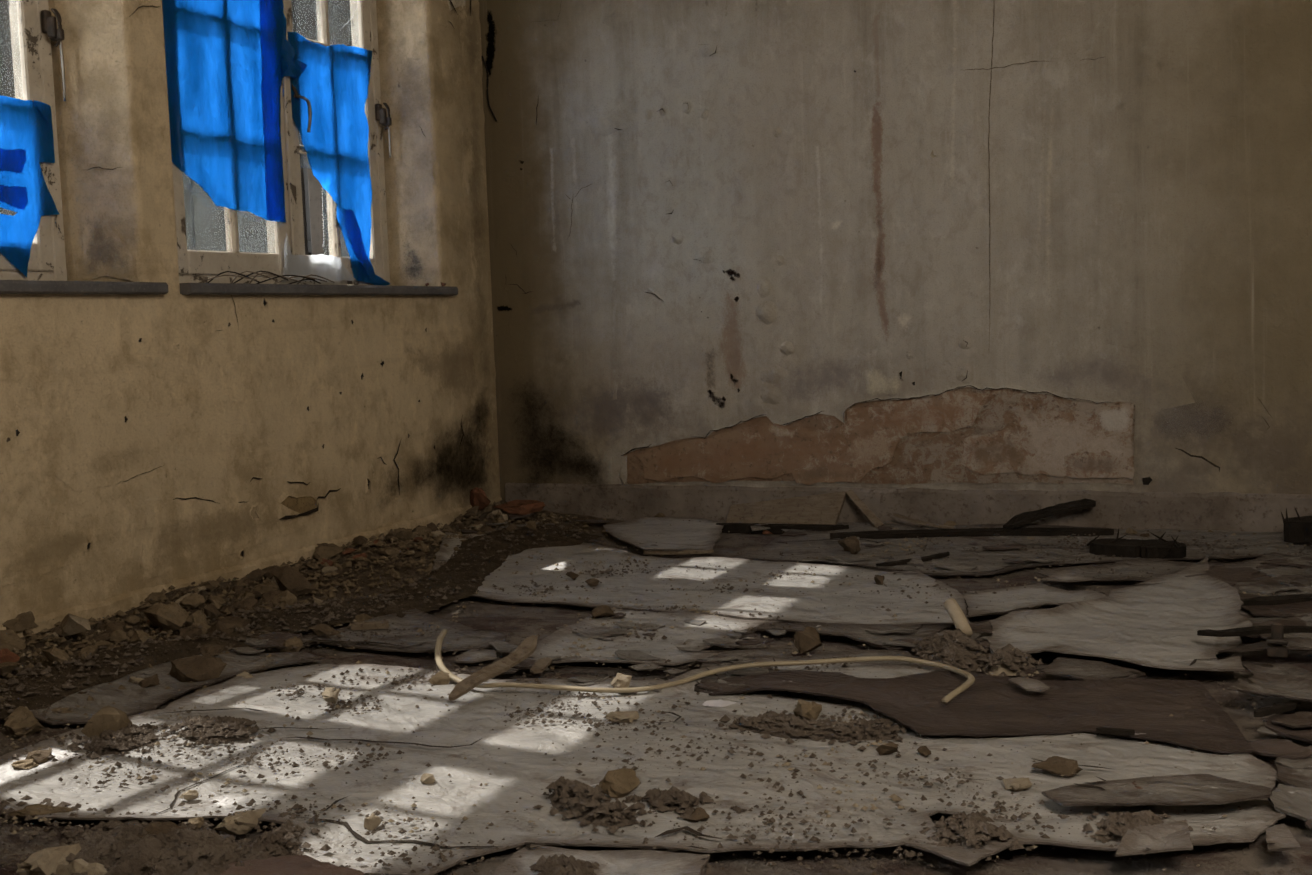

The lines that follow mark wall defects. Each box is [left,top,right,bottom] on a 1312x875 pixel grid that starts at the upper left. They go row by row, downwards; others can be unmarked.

corrosion [867,12,893,353]
crack [967,6,1040,333]
flaking render [620,369,1155,489]